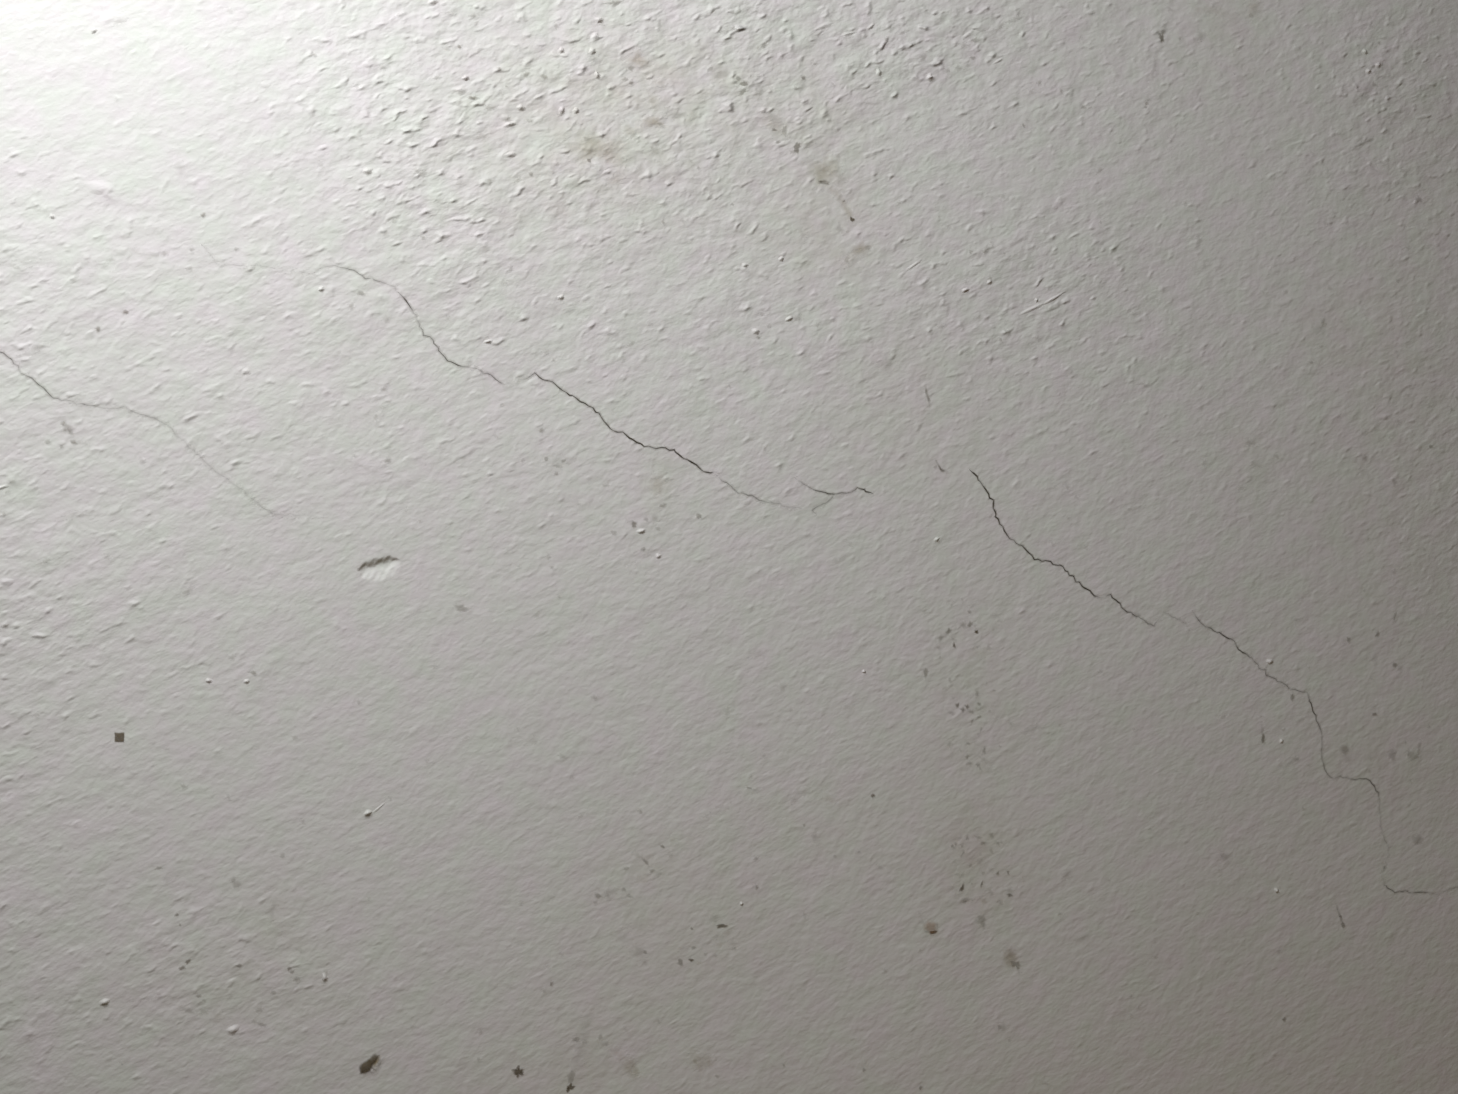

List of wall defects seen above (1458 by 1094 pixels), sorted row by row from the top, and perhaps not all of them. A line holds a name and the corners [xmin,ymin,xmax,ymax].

crack [969,469,1389,849]